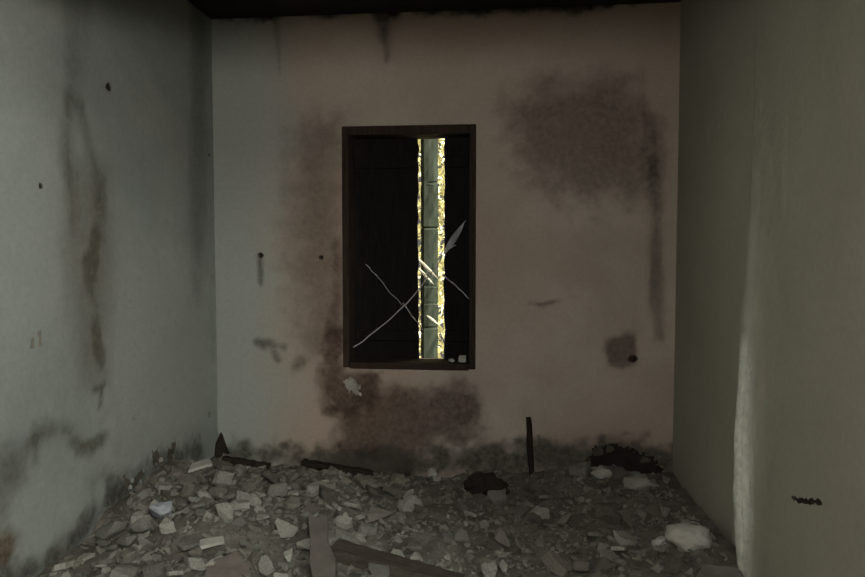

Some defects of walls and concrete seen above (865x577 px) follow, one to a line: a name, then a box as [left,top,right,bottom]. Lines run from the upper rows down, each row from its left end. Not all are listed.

leakage [0,509,95,577]